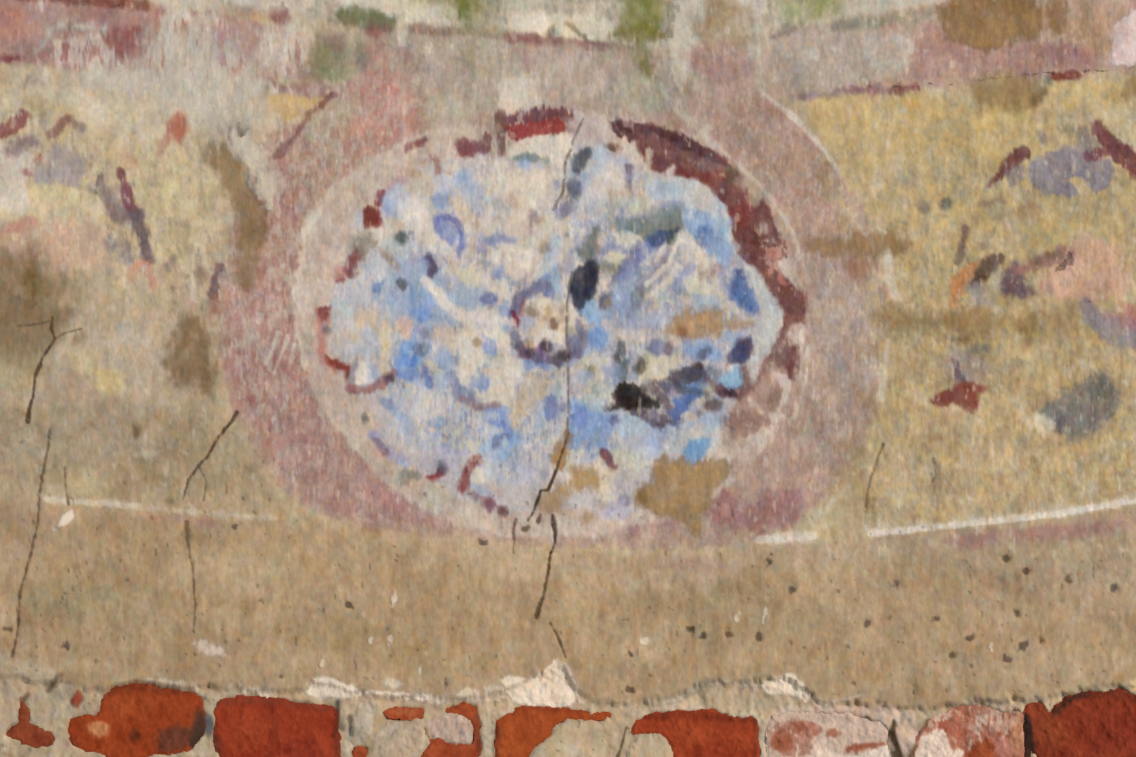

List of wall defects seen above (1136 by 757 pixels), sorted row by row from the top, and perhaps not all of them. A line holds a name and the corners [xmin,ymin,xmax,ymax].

crack [12,317,69,655]
crack [184,411,239,632]
crack [513,275,572,657]
flaking render [2,695,55,757]
flaking render [48,674,611,757]
flaking render [631,678,889,757]
flaking render [909,688,1136,757]